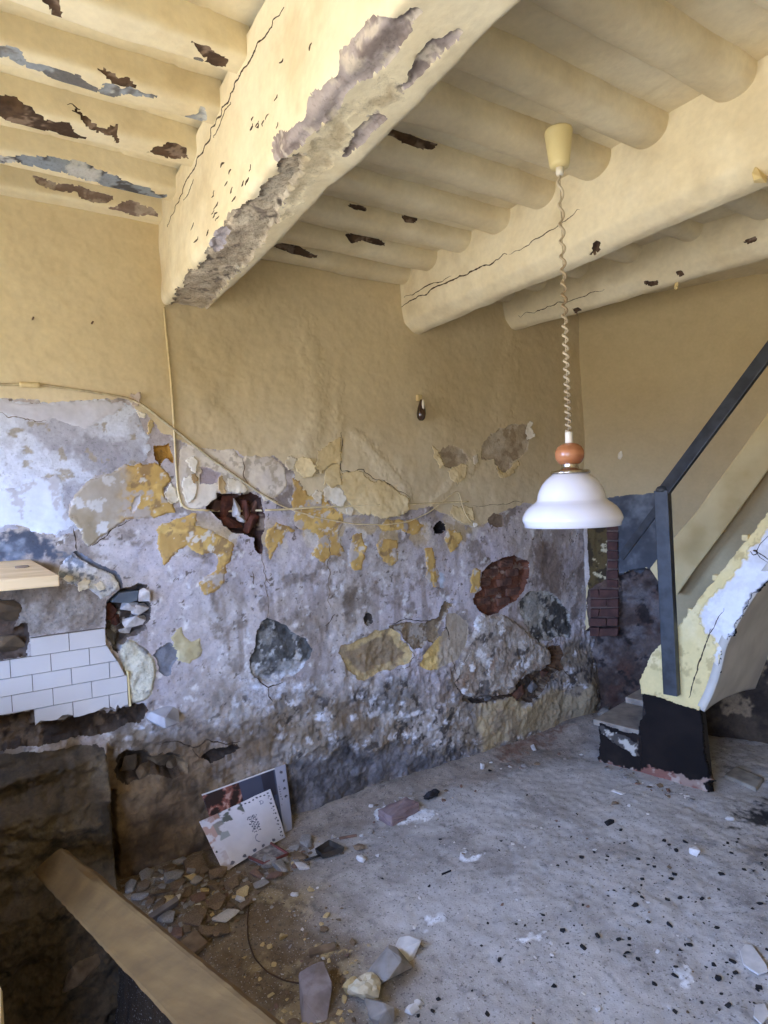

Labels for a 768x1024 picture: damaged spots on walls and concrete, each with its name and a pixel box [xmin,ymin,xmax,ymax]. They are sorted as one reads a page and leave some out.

peeling [0,94,119,143]
peeling [0,45,157,99]
peeling [0,155,167,217]
crack [167,7,284,227]
spalling [169,7,463,309]
crack [402,209,579,307]
crack [519,291,600,317]
peeling [0,392,716,880]
crack [689,612,723,697]
peeling [698,528,768,673]